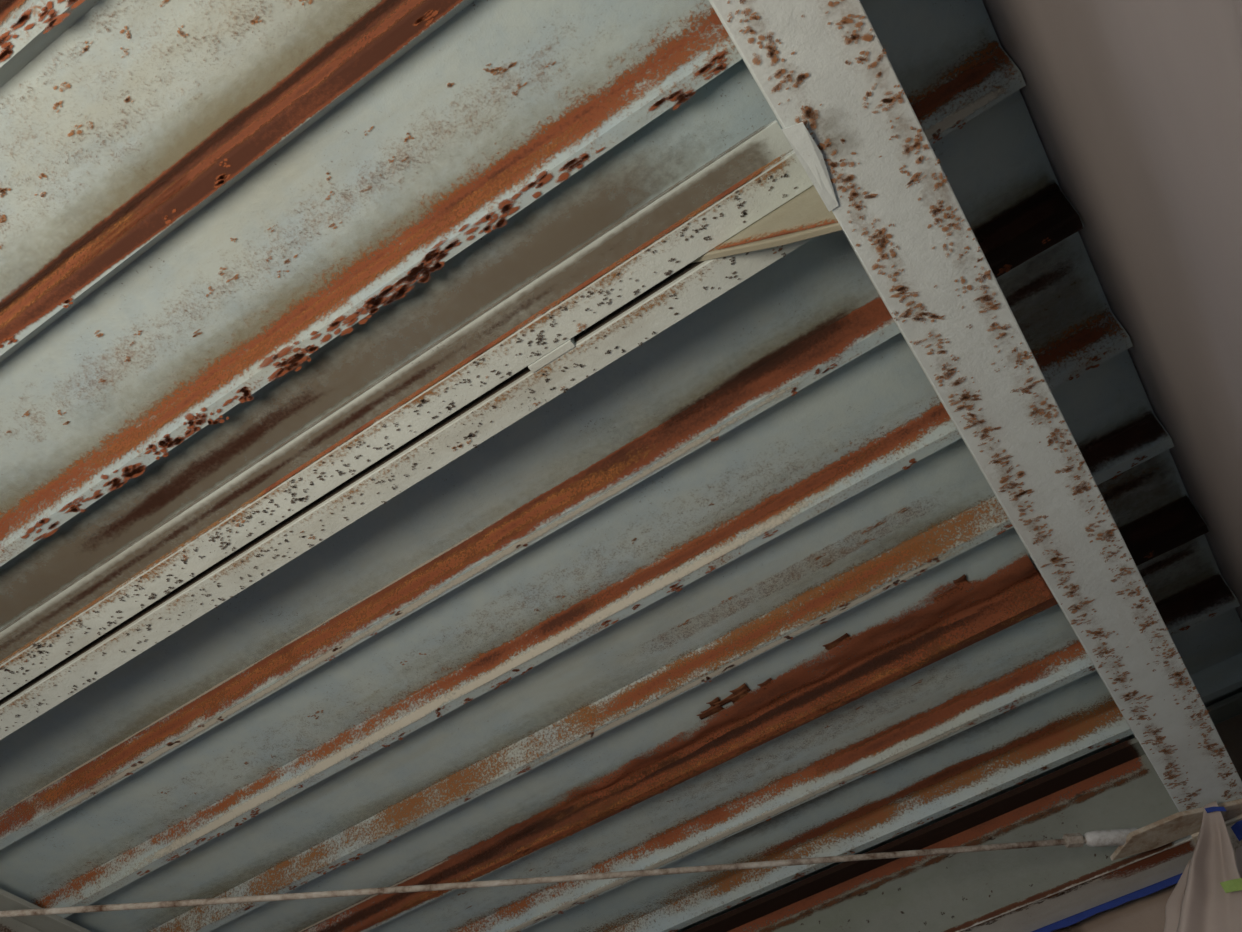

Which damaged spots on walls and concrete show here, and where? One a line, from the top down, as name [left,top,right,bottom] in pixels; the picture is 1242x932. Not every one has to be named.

corrosion [0,0,809,561]
corrosion [0,104,945,836]
corrosion [33,332,1201,932]
corrosion [826,0,1242,800]